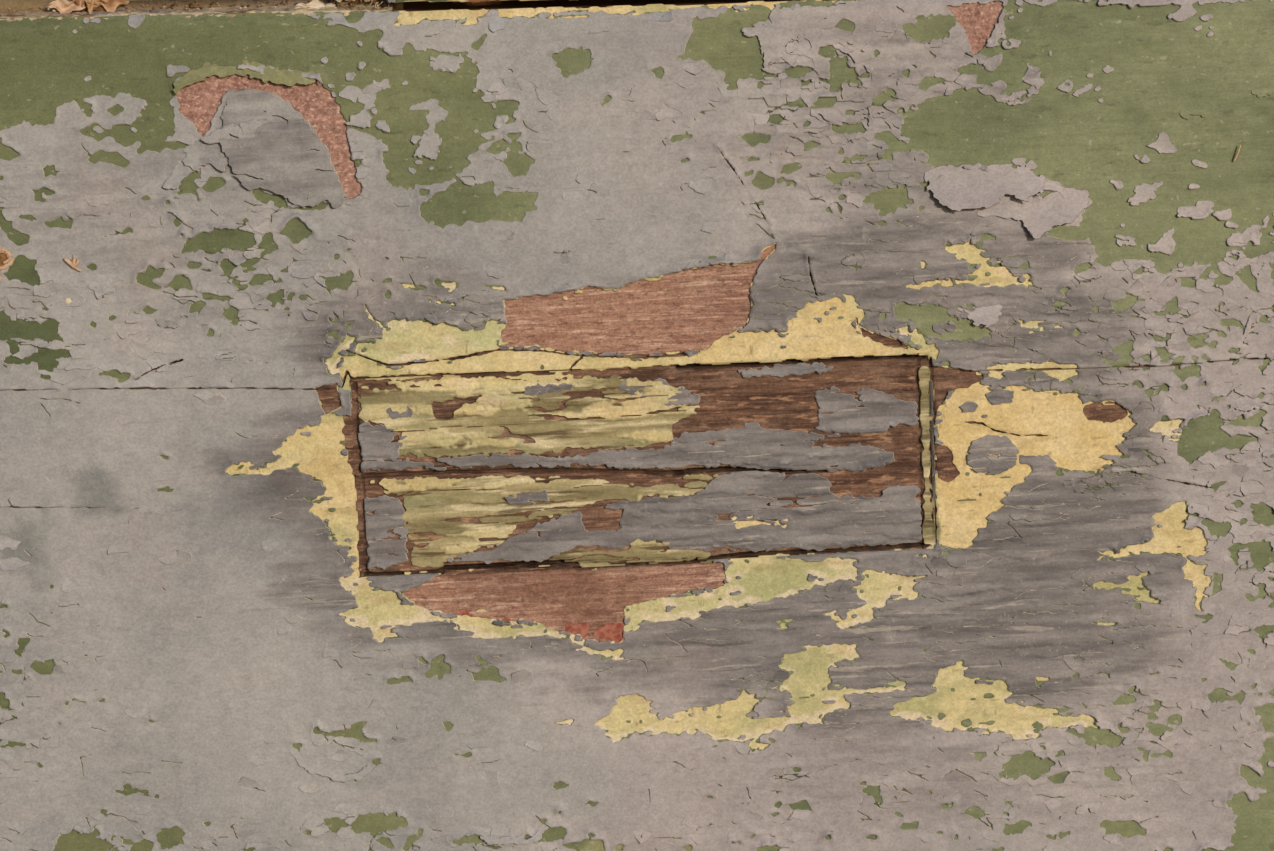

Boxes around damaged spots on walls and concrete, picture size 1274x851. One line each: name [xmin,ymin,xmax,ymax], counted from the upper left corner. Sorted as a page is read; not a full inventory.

peeling [539,47,592,79]
peeling [81,143,130,168]
peeling [0,188,114,245]
peeling [0,250,130,417]
crack [1122,358,1274,368]
crack [98,347,1086,577]
peeling [729,500,793,529]
peeling [0,578,83,778]
peeling [263,698,408,794]
peeling [595,635,1274,851]
peeling [32,772,291,851]
peeling [282,801,712,851]